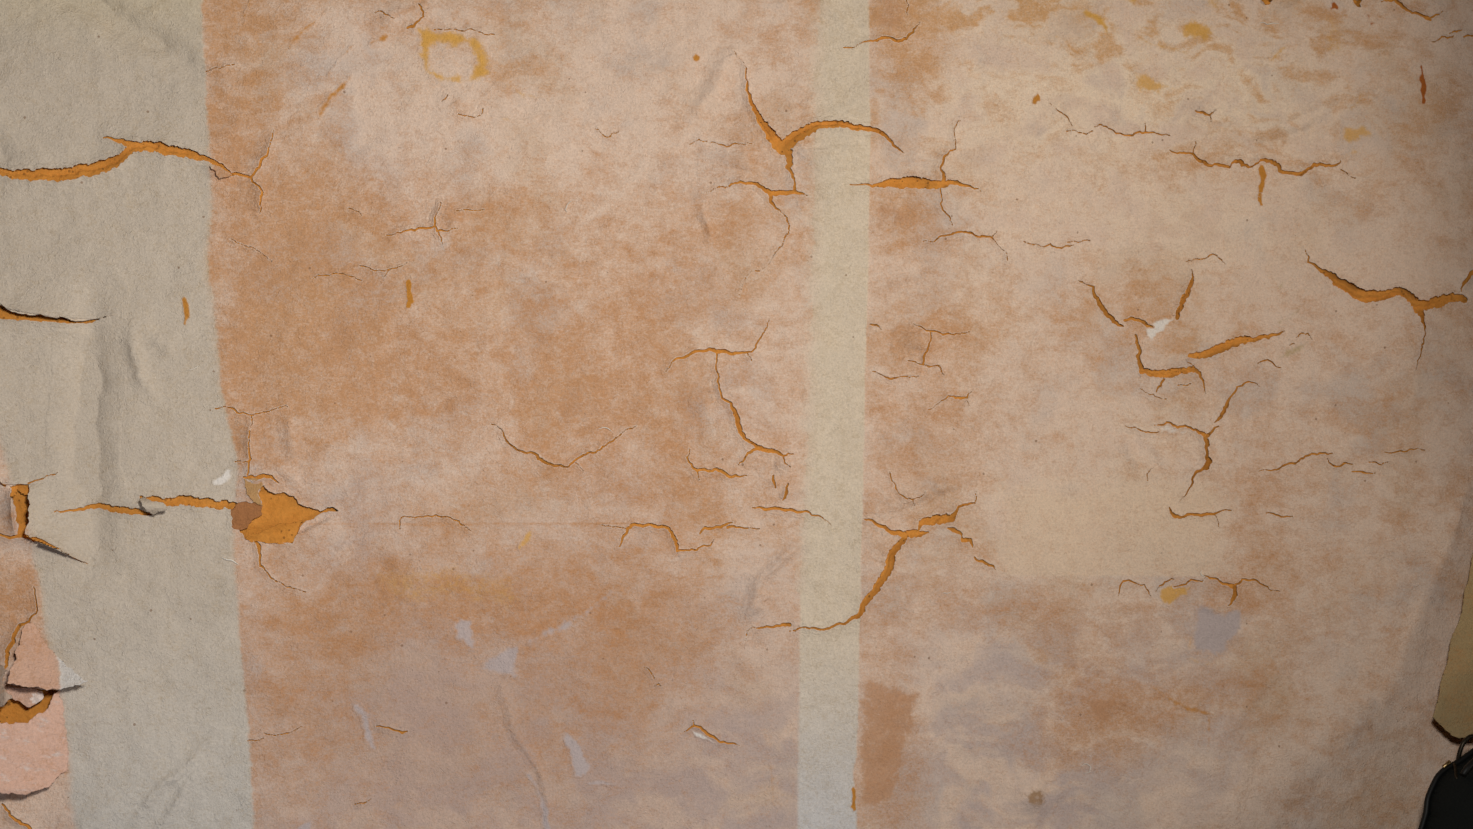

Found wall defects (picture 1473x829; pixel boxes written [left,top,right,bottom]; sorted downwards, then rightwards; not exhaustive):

crack [369,0,499,40]
crack [436,89,488,123]
crack [0,125,279,219]
crack [381,197,489,250]
crack [0,300,120,329]
crack [596,45,1430,647]
crack [1301,245,1473,375]
crack [0,400,344,724]
crack [394,509,476,537]
peeling [0,622,88,795]